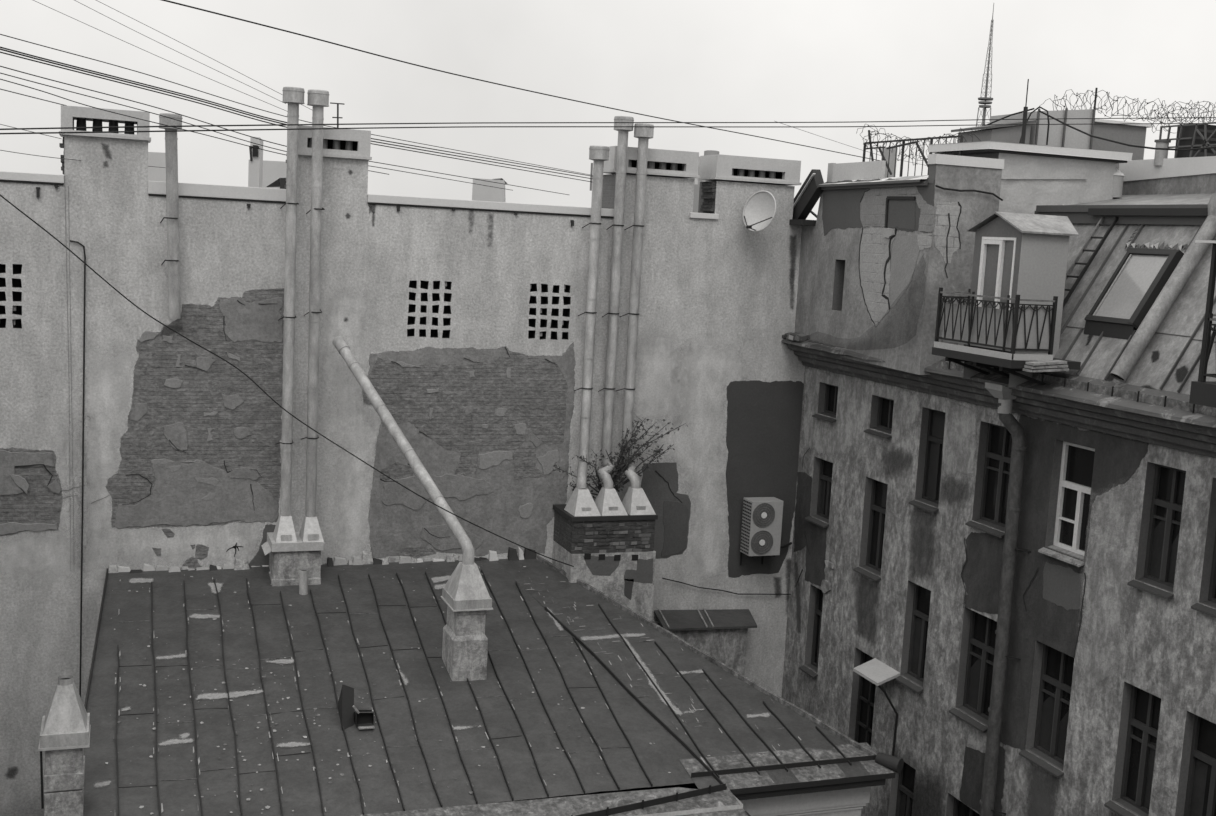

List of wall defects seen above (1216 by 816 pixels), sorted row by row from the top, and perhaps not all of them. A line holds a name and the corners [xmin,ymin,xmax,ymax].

crack [859,189,897,325]
crack [945,202,962,278]
peeling [139,331,183,388]
peeling [196,297,283,371]
flaking render [363,351,568,510]
peeling [0,450,54,495]
peeling [114,422,279,529]
peeling [395,524,484,558]